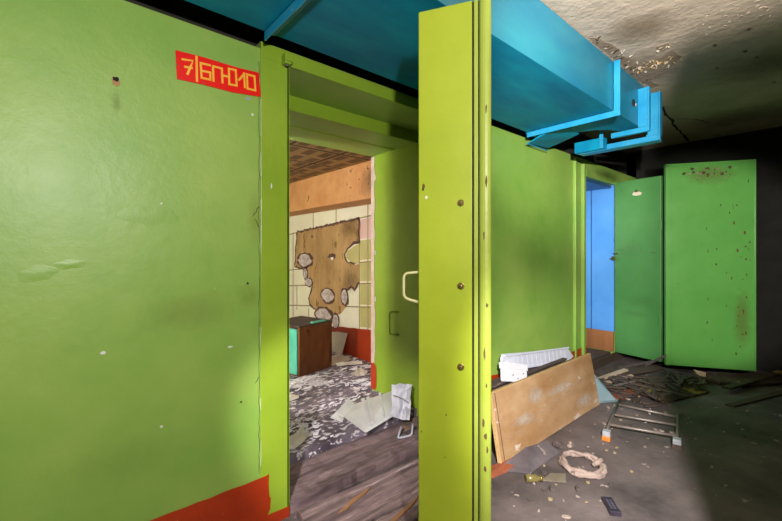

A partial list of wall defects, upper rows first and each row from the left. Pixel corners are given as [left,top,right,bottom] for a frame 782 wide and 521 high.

peeling [588,36,683,88]
crack [662,106,708,142]
spalling [294,217,360,271]